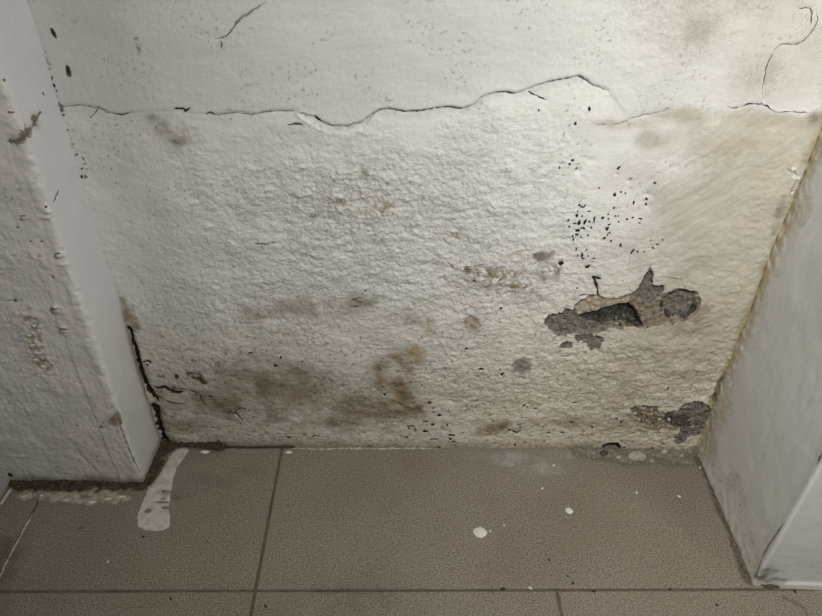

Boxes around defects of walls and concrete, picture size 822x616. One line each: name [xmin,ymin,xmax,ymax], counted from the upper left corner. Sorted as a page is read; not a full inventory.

crack [216,3,264,48]
crack [727,7,819,113]
crack [8,92,44,145]
crack [63,104,132,118]
crack [174,107,439,126]
crack [598,108,669,125]
leakage [567,204,642,279]
flaking render [544,267,702,350]
leakage [630,111,822,453]
crack [127,326,206,440]
flaking render [631,400,711,444]